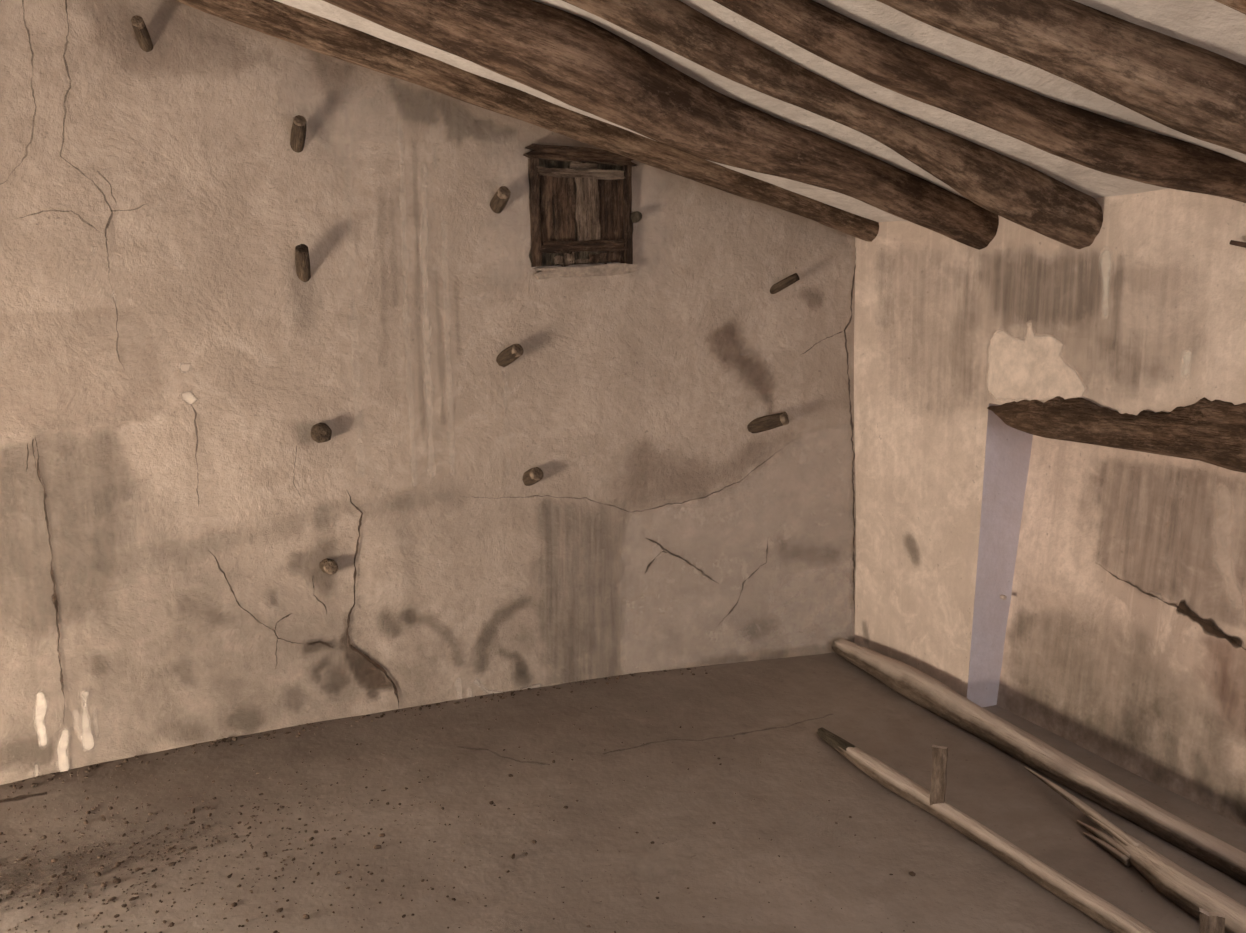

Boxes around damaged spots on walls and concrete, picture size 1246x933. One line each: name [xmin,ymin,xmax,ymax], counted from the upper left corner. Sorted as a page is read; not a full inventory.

crack [22,0,143,258]
peeling [988,324,1085,400]
crack [26,441,65,714]
crack [213,491,399,706]
crack [1105,569,1246,650]
crack [0,792,47,803]